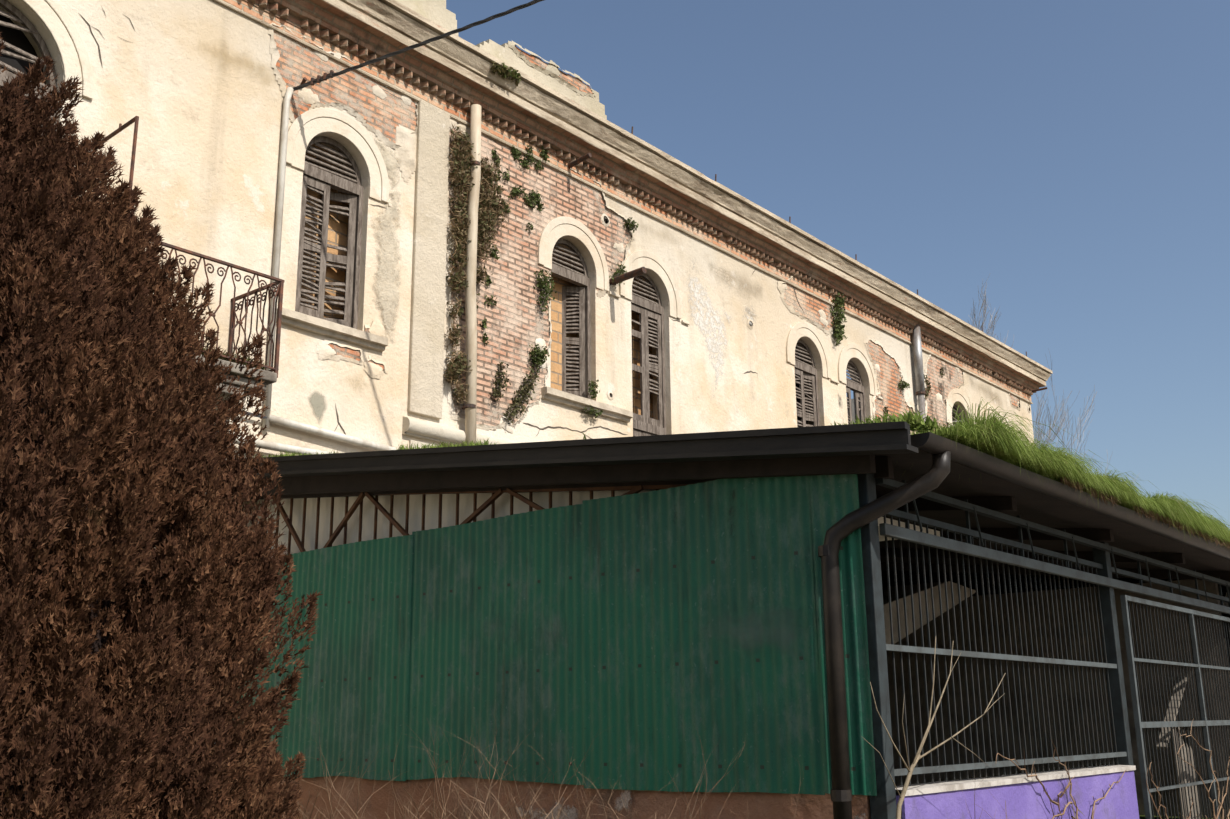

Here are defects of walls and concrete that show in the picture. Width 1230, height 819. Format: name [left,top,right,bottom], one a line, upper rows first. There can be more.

flaking render [508,41,596,98]
flaking render [268,23,418,340]
flaking render [777,276,835,336]
flaking render [316,338,388,379]
flaking render [863,337,964,429]
crack [524,423,627,439]